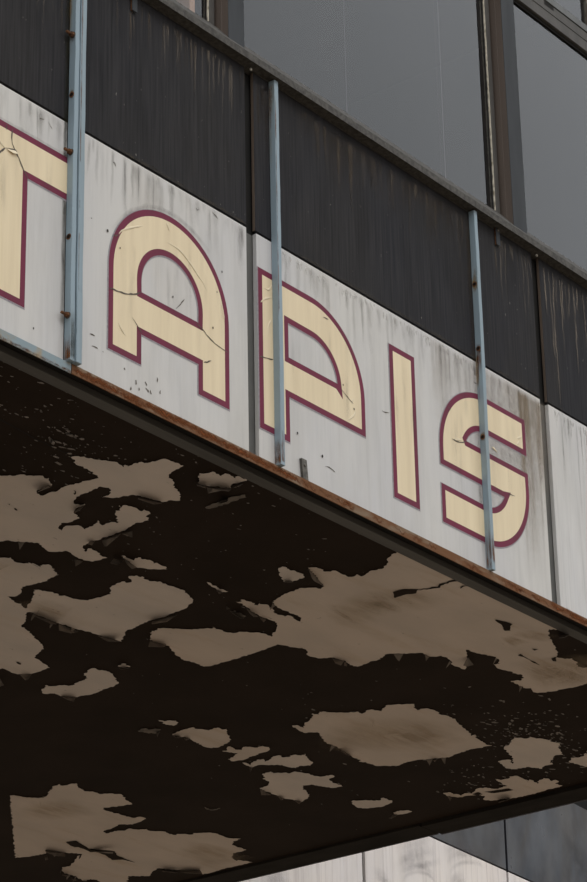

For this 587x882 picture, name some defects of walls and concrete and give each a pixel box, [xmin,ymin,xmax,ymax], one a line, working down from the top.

crack [0,124,28,178]
rust [56,340,300,483]
peeling [0,456,587,693]
peeling [42,663,130,701]
peeling [138,720,342,804]
peeling [292,704,492,766]
peeling [443,737,587,802]
peeling [10,783,250,882]
peeling [351,798,412,819]